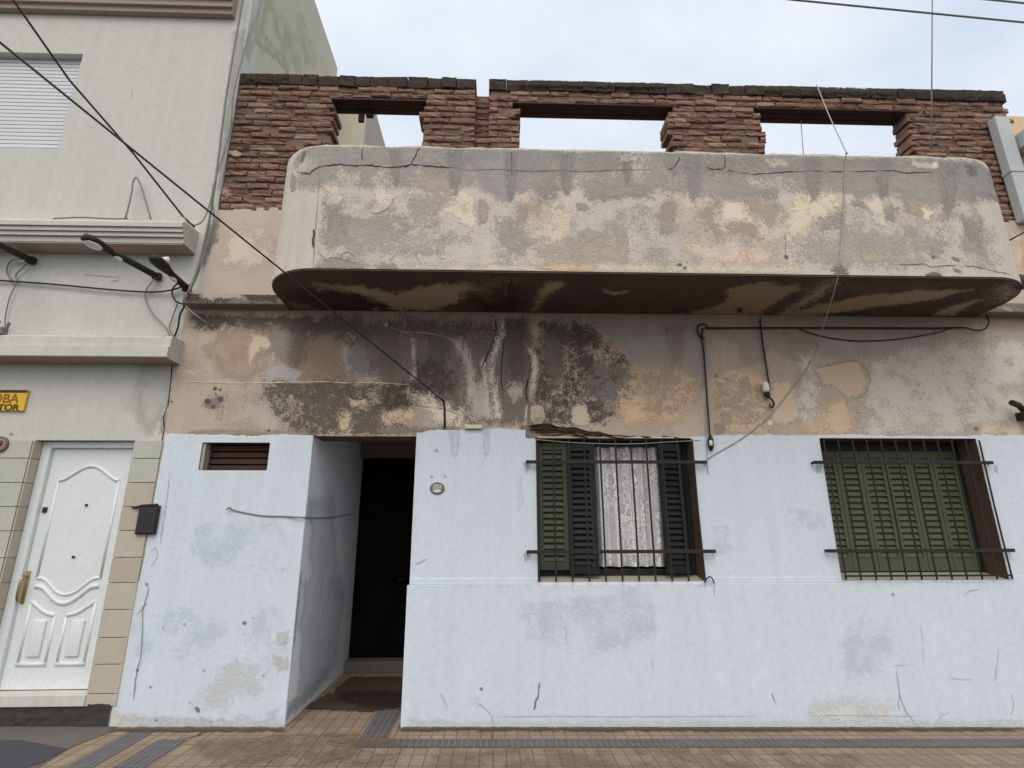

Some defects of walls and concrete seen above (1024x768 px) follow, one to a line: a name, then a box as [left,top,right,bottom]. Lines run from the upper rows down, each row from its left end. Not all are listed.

peeling [308,179,490,312]
crack [390,279,546,422]
crack [296,148,680,263]
spalling [519,424,537,439]
damp [121,146,1005,458]
peeling [509,194,629,247]
peeling [581,329,1024,437]
peeling [654,186,1024,317]
peeling [911,161,939,169]
crack [133,365,461,700]
crack [465,683,569,739]
crack [813,627,949,725]